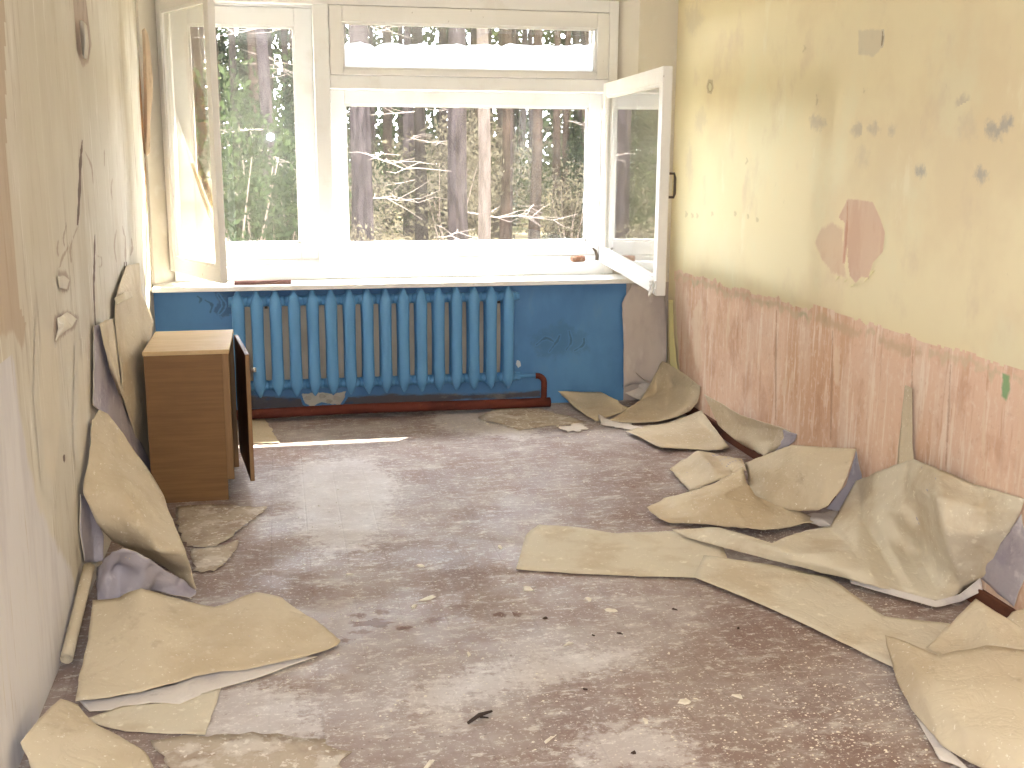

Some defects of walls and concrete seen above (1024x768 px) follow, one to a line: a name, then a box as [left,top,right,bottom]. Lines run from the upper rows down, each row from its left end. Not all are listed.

peeling [811,197,886,287]